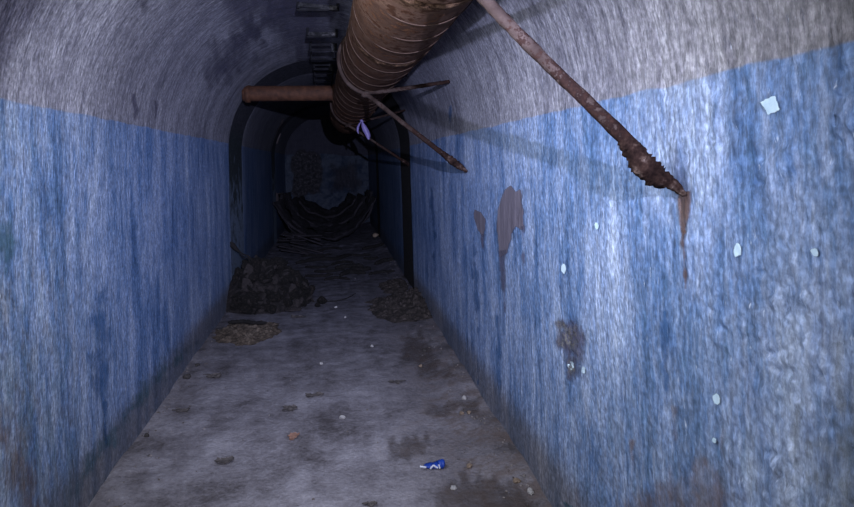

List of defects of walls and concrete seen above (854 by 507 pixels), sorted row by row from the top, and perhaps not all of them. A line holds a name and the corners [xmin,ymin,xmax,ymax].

water stain [557,322,584,378]